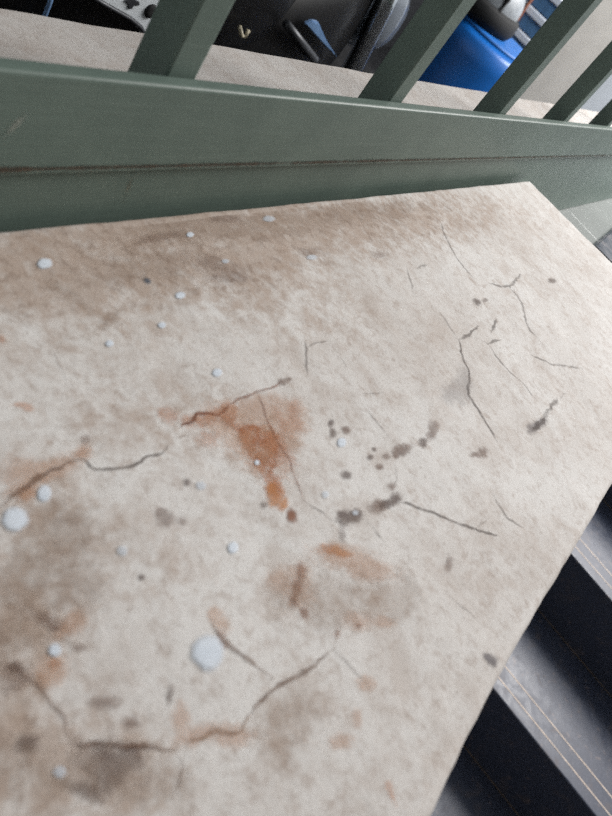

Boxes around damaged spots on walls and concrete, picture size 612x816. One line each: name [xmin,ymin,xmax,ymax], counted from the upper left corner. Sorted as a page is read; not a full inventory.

crack [181,407,227,425]
crack [12,452,164,496]
corrosion [268,483,296,521]
water stain [338,510,359,524]
crack [408,503,494,535]
crack [260,658,322,703]
crack [114,742,148,750]